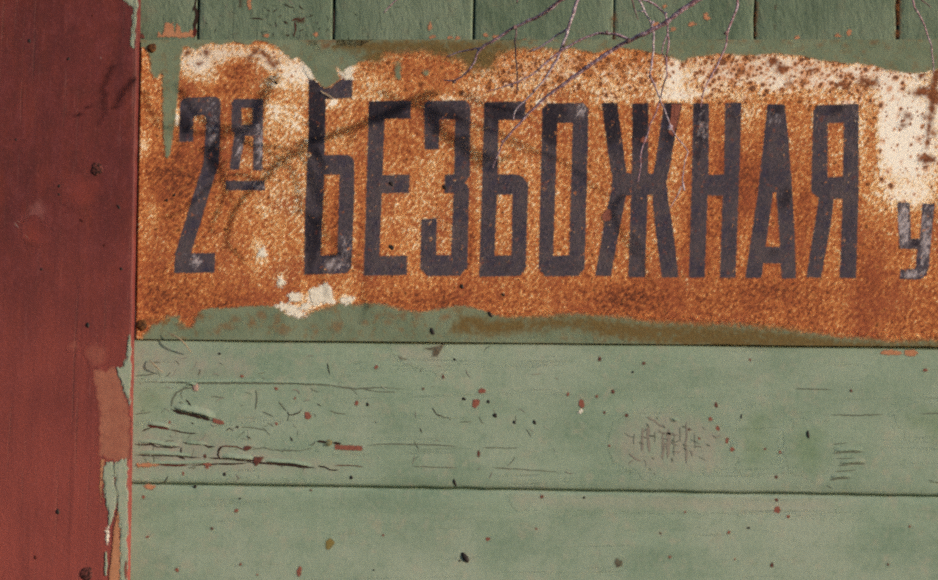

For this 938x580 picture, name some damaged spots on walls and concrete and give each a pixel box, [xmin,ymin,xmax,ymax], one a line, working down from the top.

peeling [123,0,145,48]
peeling [158,22,194,38]
corrosion [182,46,213,68]
corrosion [245,45,282,75]
corrosion [297,40,526,79]
corrosion [747,54,795,88]
corrosion [836,75,882,93]
corrosion [896,70,938,167]
corrosion [437,305,938,347]
peeling [65,334,362,580]